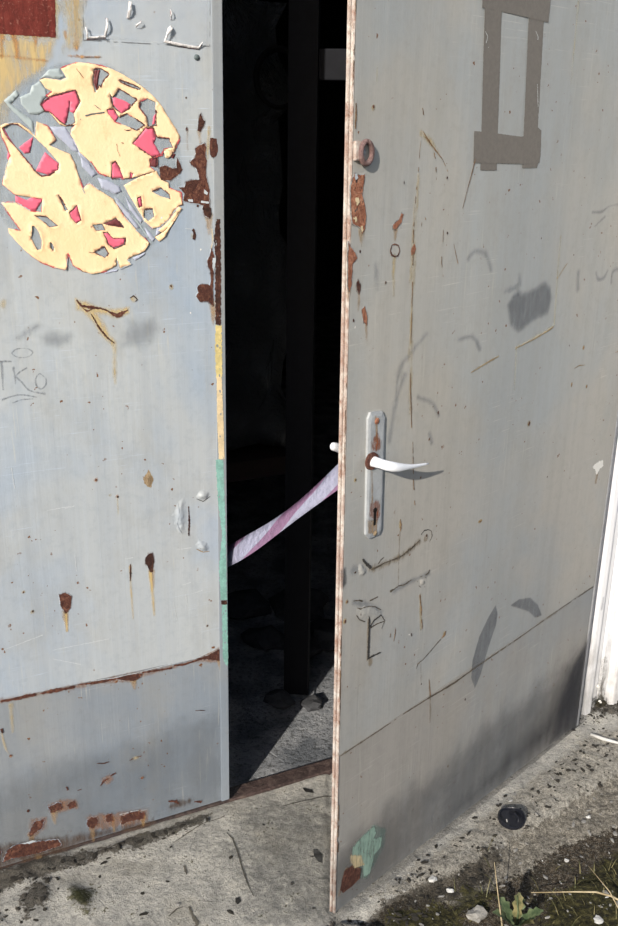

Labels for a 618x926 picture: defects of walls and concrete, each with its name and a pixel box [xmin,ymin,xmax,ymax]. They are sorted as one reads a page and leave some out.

peeling [0,62,183,274]
corrosion [158,112,221,325]
corrosion [349,172,366,235]
corrosion [346,241,361,294]
corrosion [76,295,138,343]
corrosion [353,305,368,328]
corrosion [144,552,155,591]
corrosion [58,592,73,631]
corrosion [0,801,148,867]
peeling [340,828,385,893]